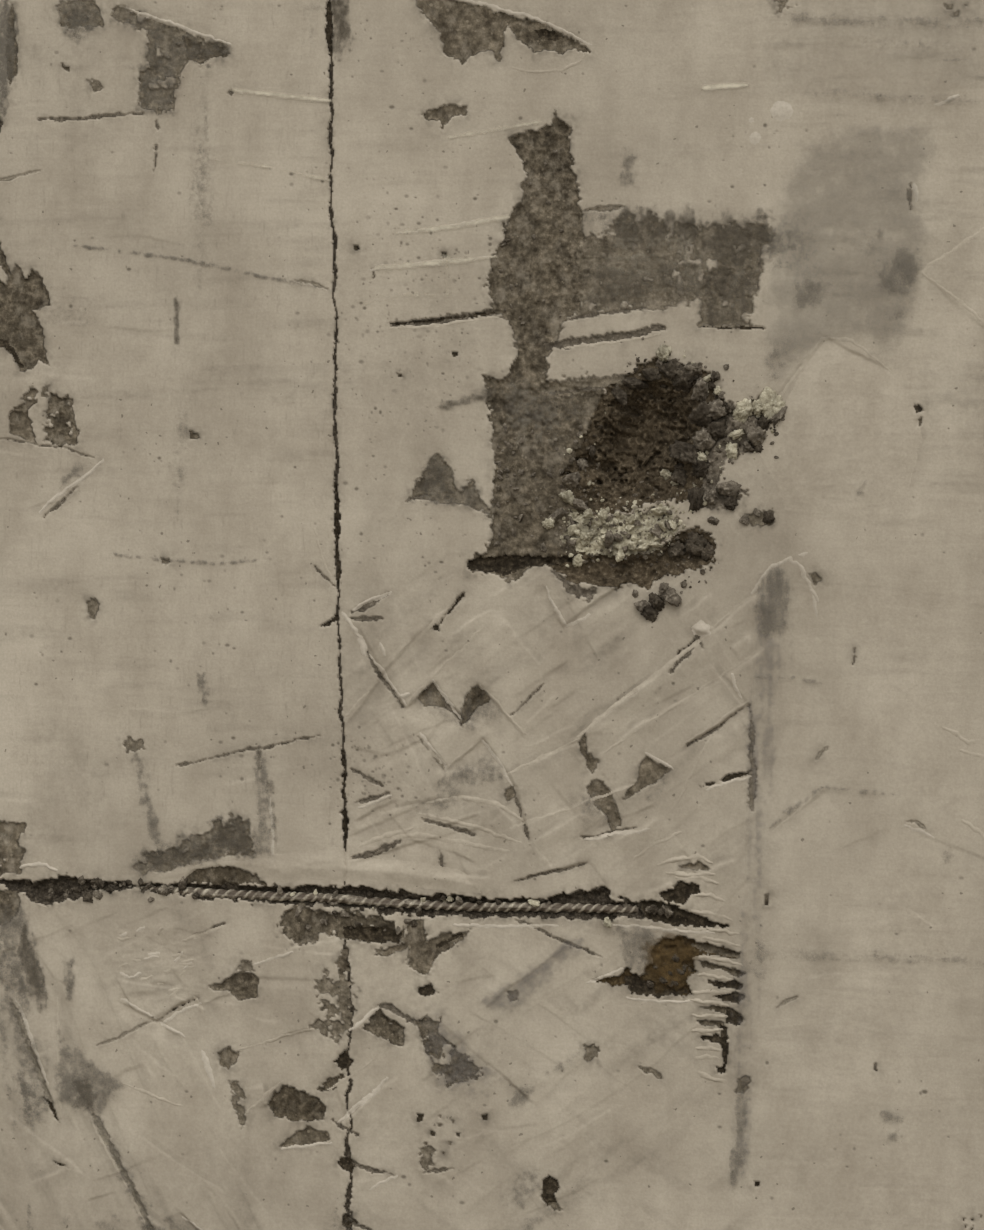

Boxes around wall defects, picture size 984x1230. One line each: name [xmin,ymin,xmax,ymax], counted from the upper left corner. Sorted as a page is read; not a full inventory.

peeling [38,0,232,129]
peeling [417,0,592,74]
spalling [0,243,50,371]
spalling [389,114,795,623]
spalling [7,387,88,456]
crack [254,0,350,852]
crack [178,737,309,766]
spalling [0,821,26,876]
spalling [134,813,254,875]
spalling [277,902,466,996]
crack [0,862,729,1230]
peeling [531,1175,561,1211]